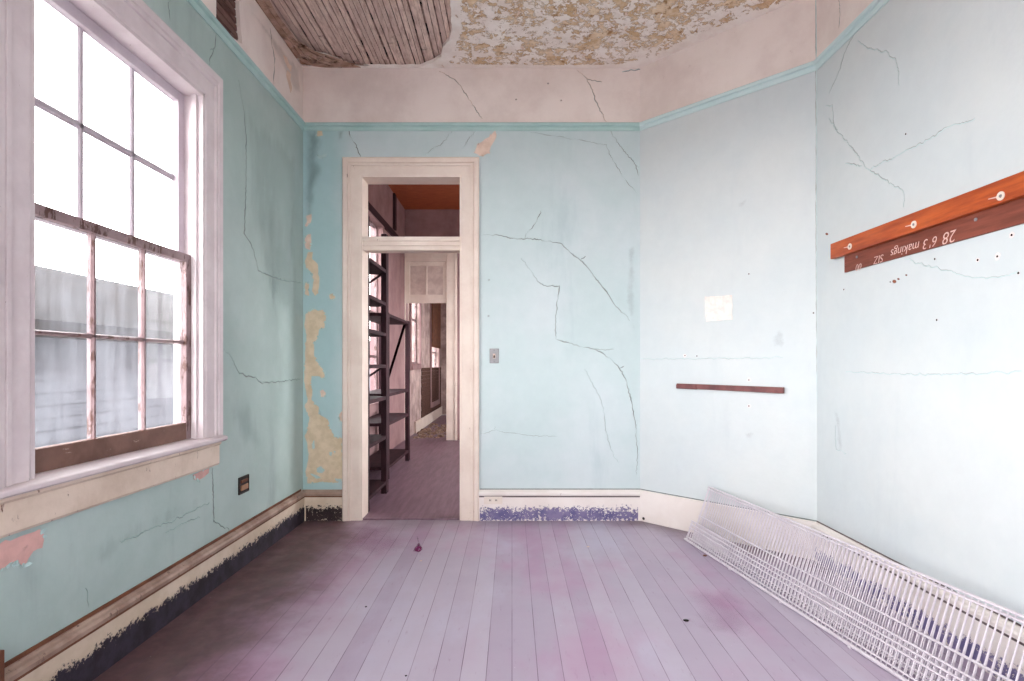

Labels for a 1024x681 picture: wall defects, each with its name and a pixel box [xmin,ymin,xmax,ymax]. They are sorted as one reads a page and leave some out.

peeling [322,0,781,68]
crack [238,80,301,283]
spalling [474,131,496,156]
crack [530,68,640,193]
crack [815,0,975,381]
crack [904,258,1018,279]
crack [223,349,300,384]
peeling [303,214,342,484]
crack [481,210,783,475]
spalling [0,528,47,571]
peeling [49,505,342,681]
peeling [480,504,638,521]